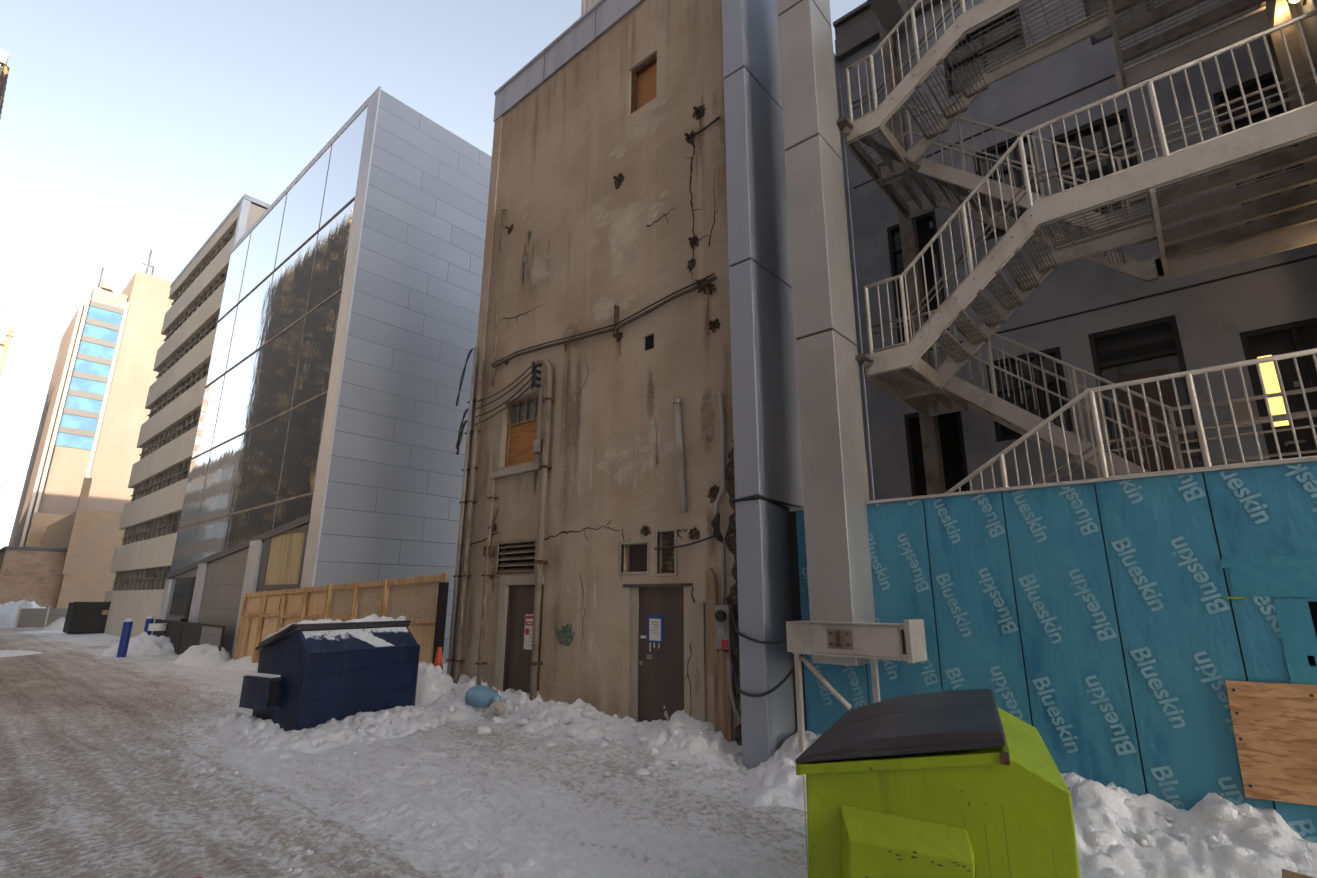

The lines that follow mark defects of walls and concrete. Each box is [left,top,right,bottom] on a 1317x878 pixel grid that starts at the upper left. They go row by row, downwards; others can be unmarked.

crack [646,132,721,286]
leakage [475,219,670,716]
crack [544,521,631,576]